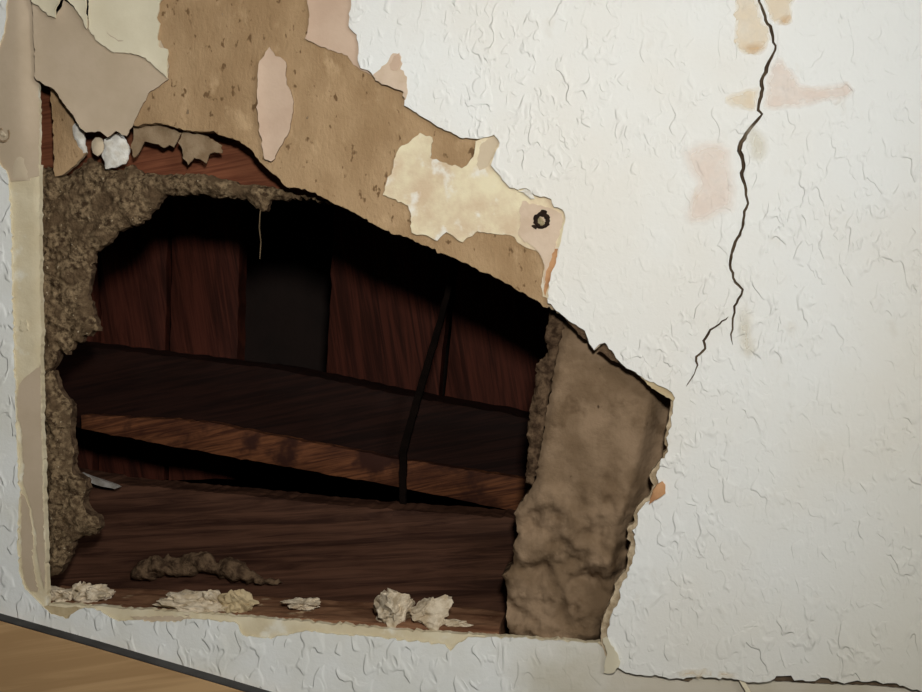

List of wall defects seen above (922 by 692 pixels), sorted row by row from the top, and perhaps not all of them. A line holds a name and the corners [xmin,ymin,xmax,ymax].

peeling [31,0,170,169]
peeling [256,47,294,162]
peeling [305,0,408,101]
crack [687,0,776,385]
spalling [10,133,675,656]